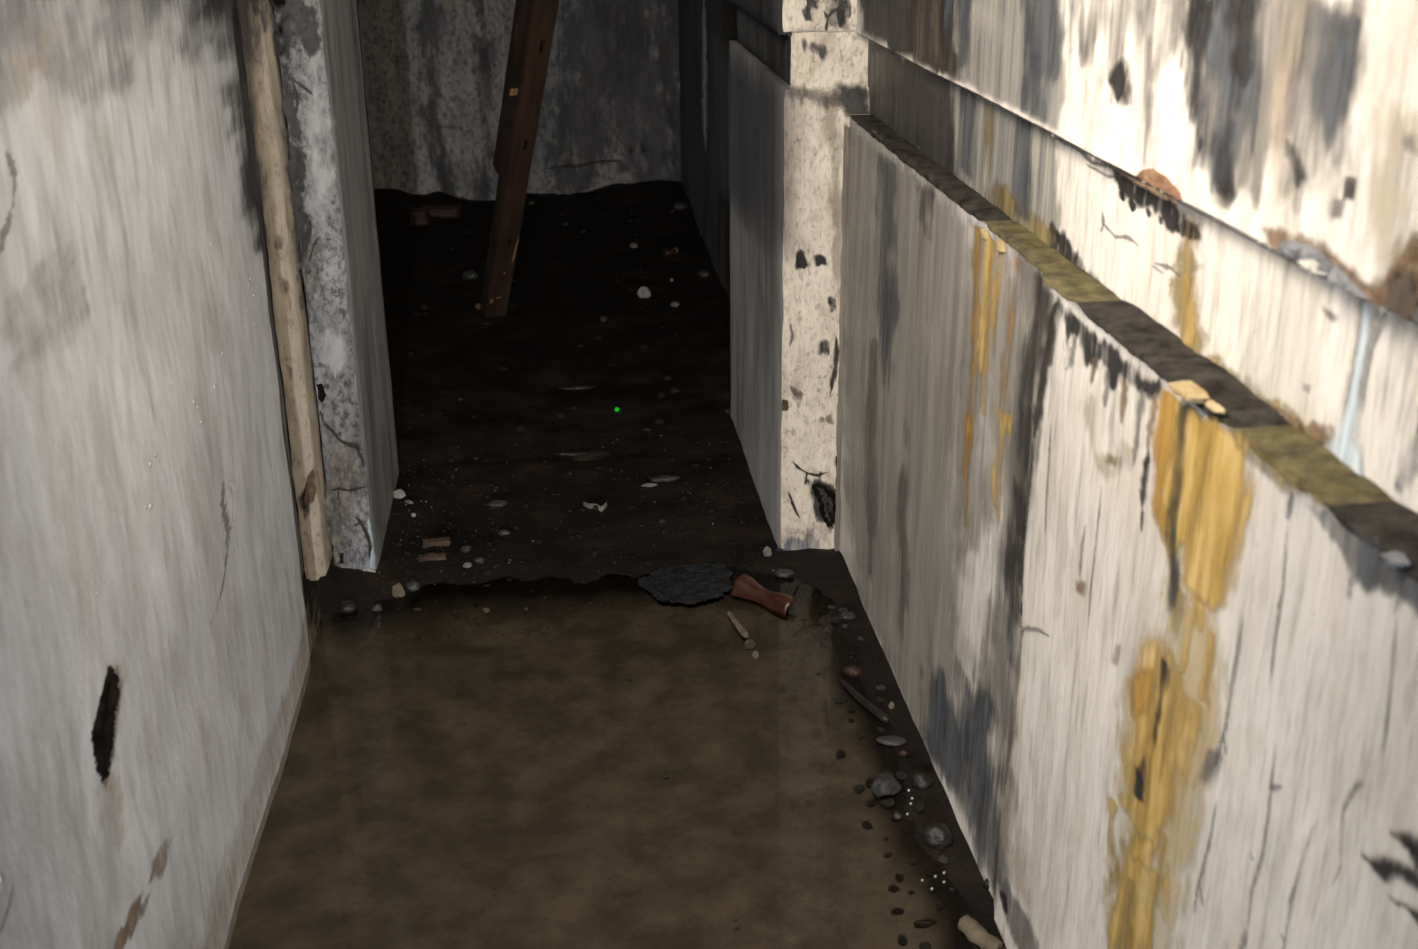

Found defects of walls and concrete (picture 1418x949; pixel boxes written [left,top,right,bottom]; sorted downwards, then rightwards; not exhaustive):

crack [0,151,17,251]
rust [957,227,1020,554]
damp [860,0,1155,244]
crack [807,0,1297,264]
damp [1167,380,1225,414]
rust [1170,221,1333,448]
damp [1170,0,1362,205]
damp [1267,229,1388,476]
spalling [1365,234,1418,324]
damp [843,124,1069,949]
rust [1107,390,1297,949]
damp [1320,511,1418,614]